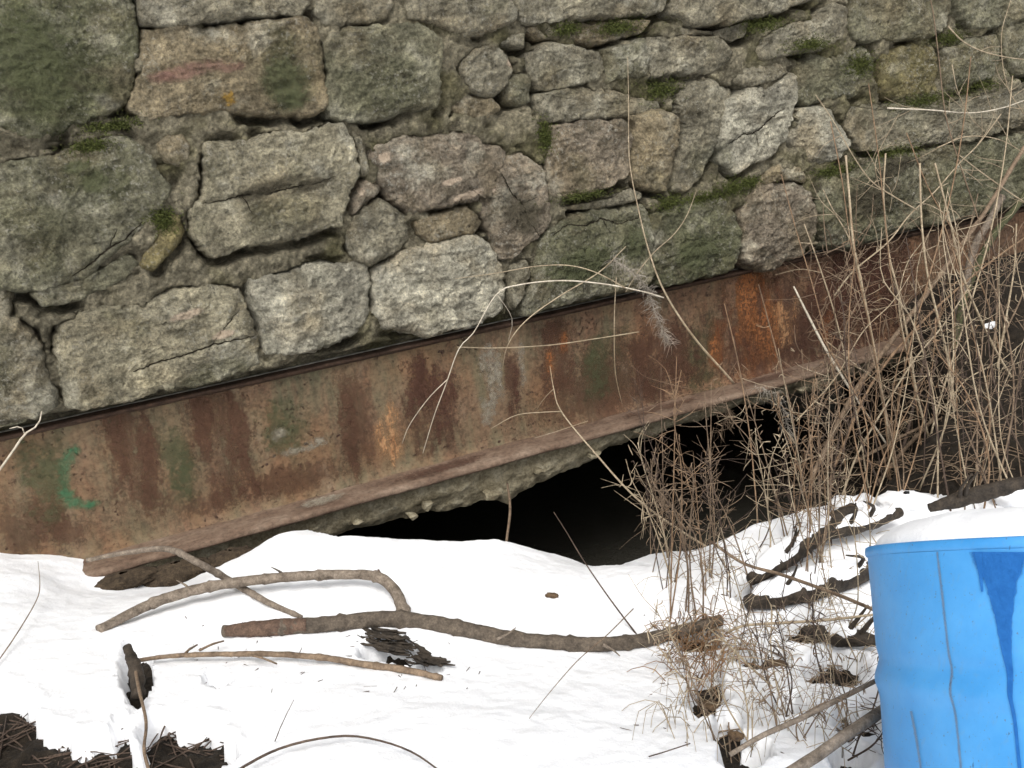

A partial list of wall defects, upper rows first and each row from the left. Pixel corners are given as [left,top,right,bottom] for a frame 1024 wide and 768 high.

crack [211,176,336,214]
crack [133,309,254,372]
rust [504,349,521,413]
rust [375,355,478,481]
spalling [136,352,905,568]